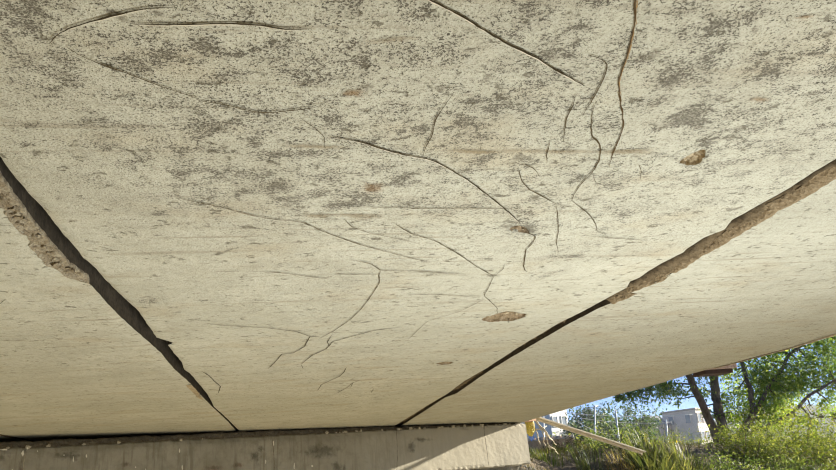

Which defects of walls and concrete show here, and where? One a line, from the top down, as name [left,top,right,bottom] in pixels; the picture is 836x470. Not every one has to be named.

spalling [0,171,89,284]
crack [49,0,648,368]
spalling [663,142,723,172]
spalling [474,309,535,324]